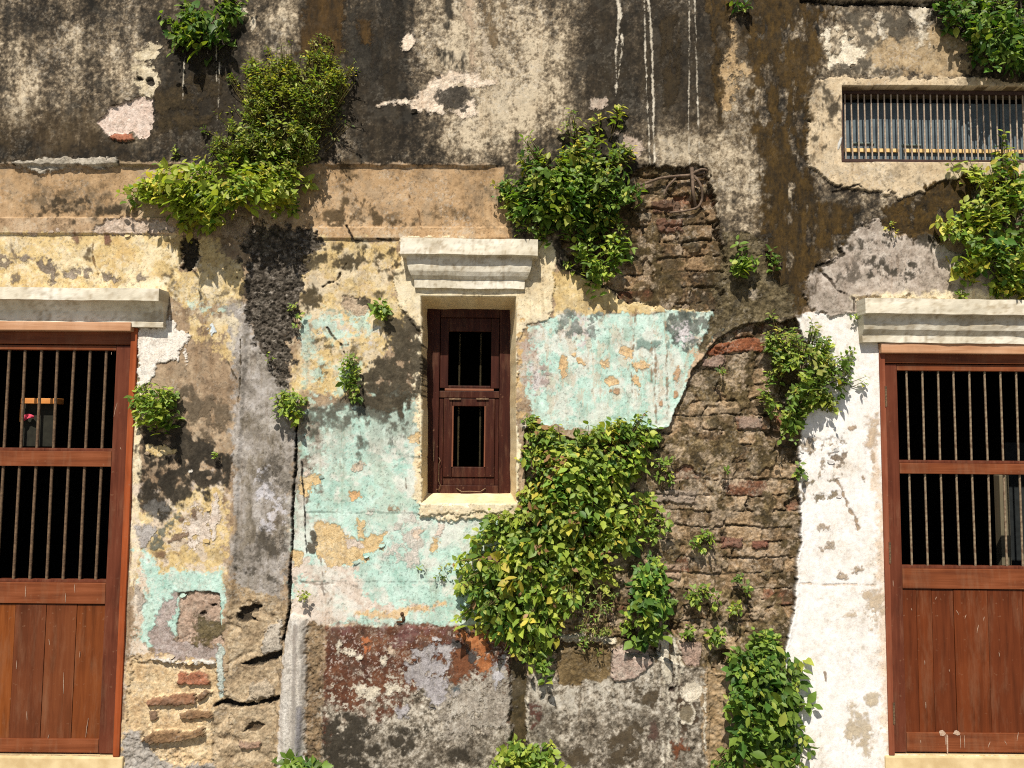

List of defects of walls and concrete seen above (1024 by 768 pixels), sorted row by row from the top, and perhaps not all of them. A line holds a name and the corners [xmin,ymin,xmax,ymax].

spalling [97,41,162,141]
leakage [153,38,246,134]
leakage [295,0,403,83]
spalling [376,69,497,119]
leakage [615,0,623,92]
leakage [644,0,974,323]
leakage [300,283,322,313]
leakage [300,242,404,298]
peeling [136,317,191,387]
spalling [523,132,847,686]
peeling [291,506,445,572]
spalling [125,590,286,768]